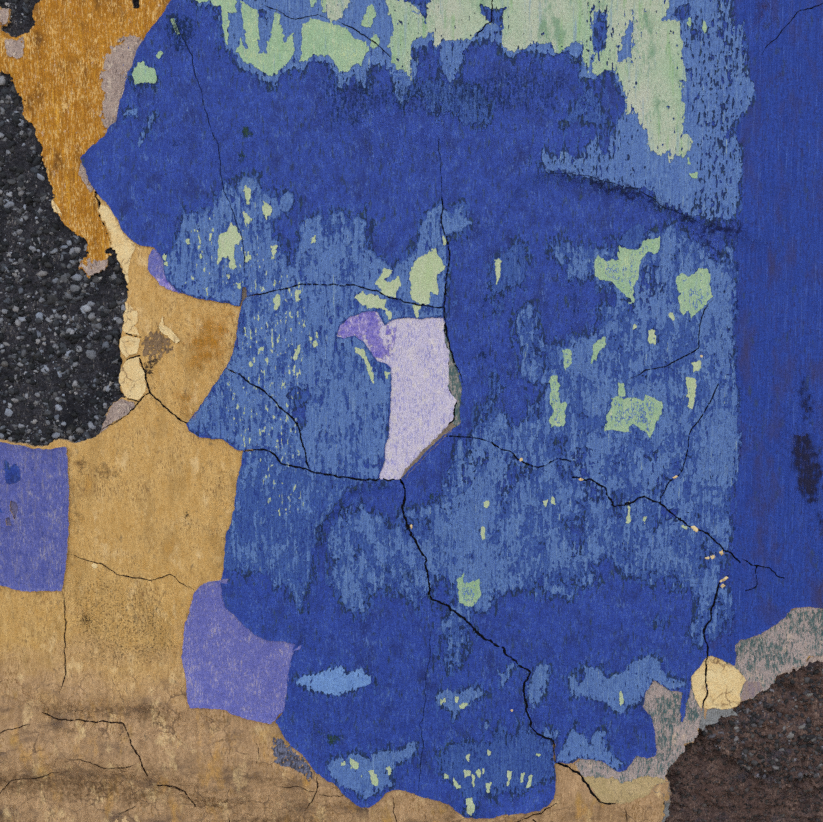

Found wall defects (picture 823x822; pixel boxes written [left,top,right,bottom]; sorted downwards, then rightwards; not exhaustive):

crack [763,3,823,52]
peeling [148,0,757,724]
crack [630,302,710,379]
crack [453,385,783,591]
crack [59,594,67,693]
crack [74,555,194,590]
crack [227,368,628,821]
crack [702,581,720,708]
crack [0,713,195,805]
spalling [429,607,823,822]